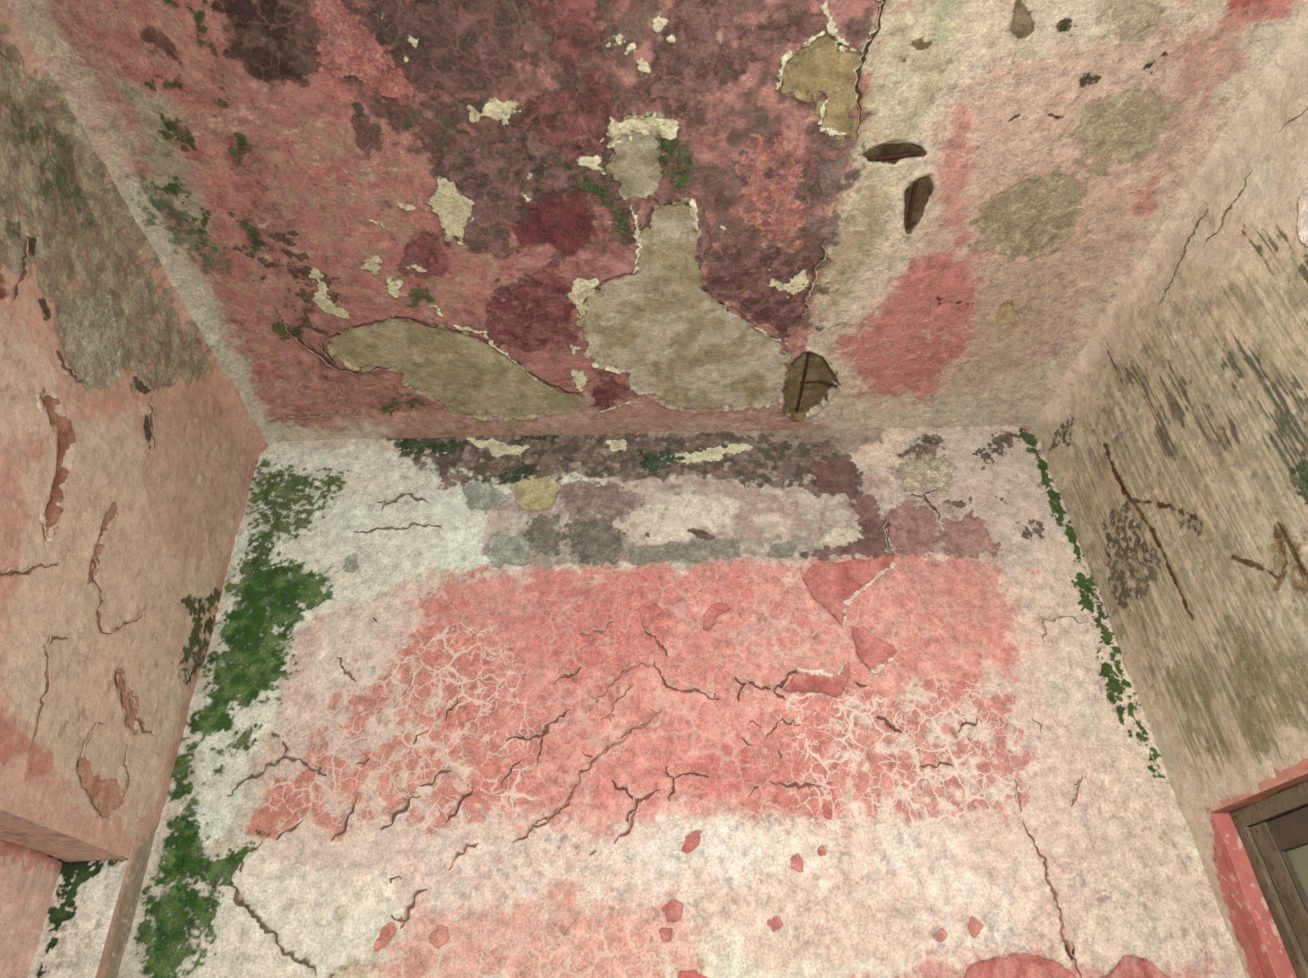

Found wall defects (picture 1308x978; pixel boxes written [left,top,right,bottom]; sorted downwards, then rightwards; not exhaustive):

spalling [309,111,842,422]
spalling [510,475,559,511]
spalling [687,528,714,540]
water stain [1103,499,1162,612]
water stain [1107,351,1240,461]
water stain [1216,336,1308,499]
crack [227,741,327,796]
crack [330,620,822,929]
water stain [1161,620,1308,779]
crack [218,820,351,978]
peeling [968,916,983,938]
crack [1014,778,1082,978]